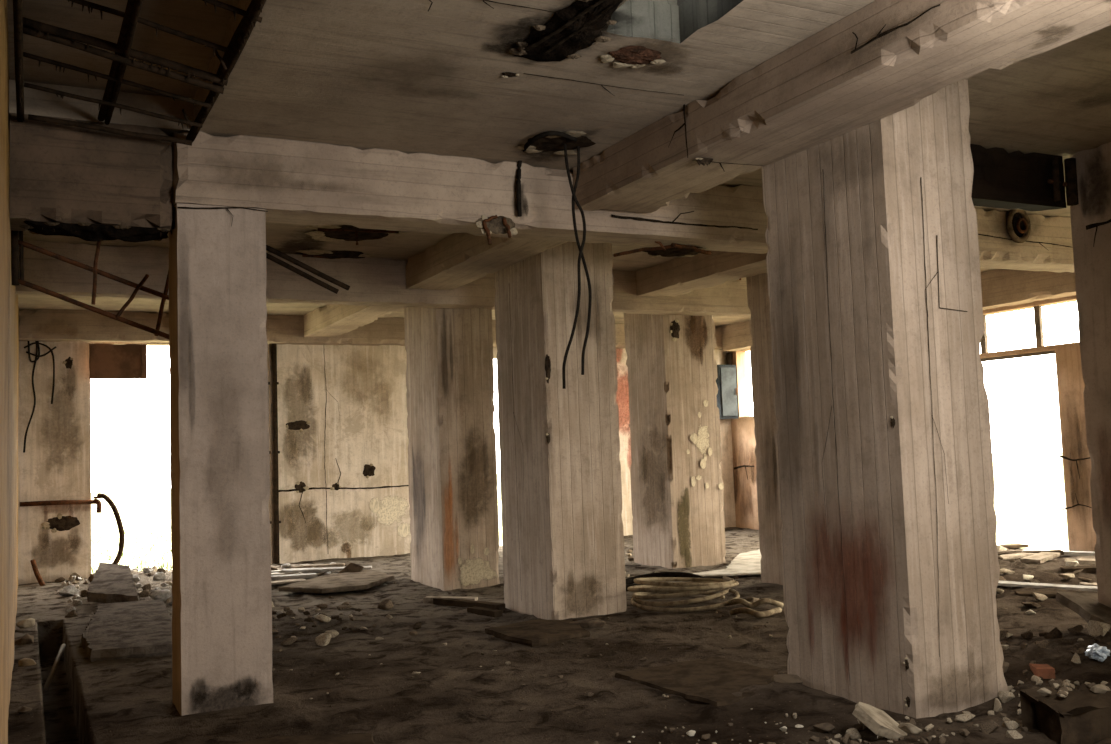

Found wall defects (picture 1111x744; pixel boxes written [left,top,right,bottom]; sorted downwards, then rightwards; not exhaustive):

spalling [296,225,407,259]
water stain [280,502,326,551]